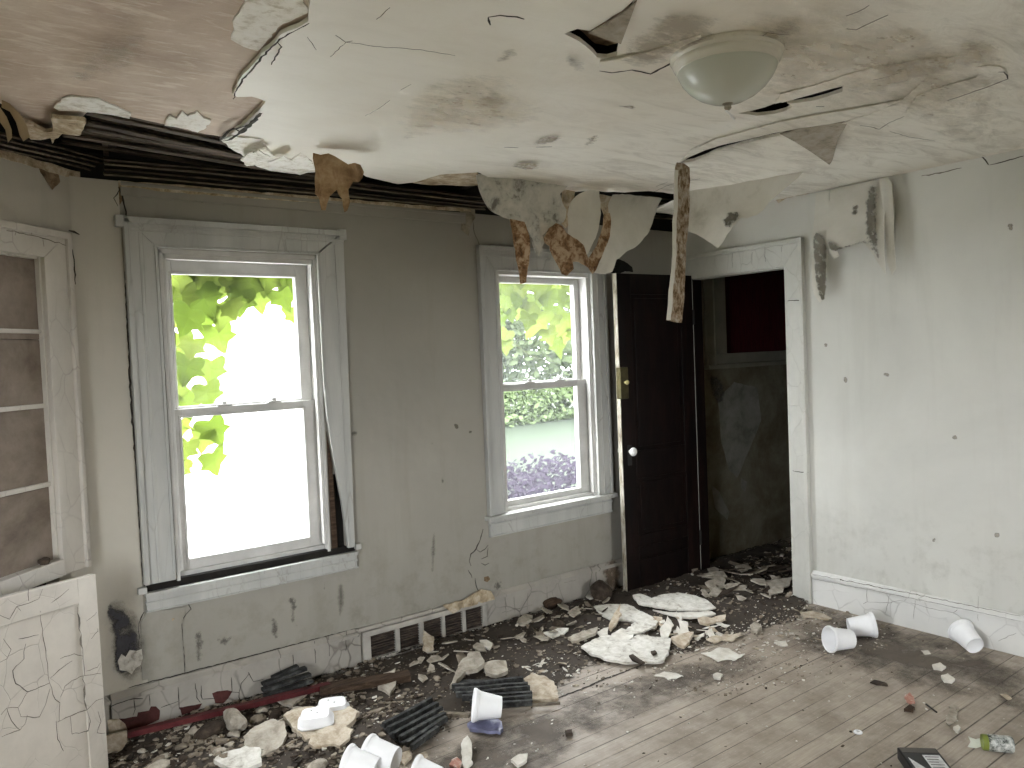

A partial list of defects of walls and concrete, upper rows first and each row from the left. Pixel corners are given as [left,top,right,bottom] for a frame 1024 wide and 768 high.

crack [233,23,455,99]
flaking render [588,0,702,72]
flaking render [0,0,315,190]
flaking render [414,172,478,186]
spalling [611,259,633,273]
crack [468,530,489,590]
crack [813,574,1019,641]
flaking render [118,649,143,674]
peeling [120,706,160,730]
crack [0,589,356,750]
peeling [179,703,202,717]
peeling [212,690,232,703]